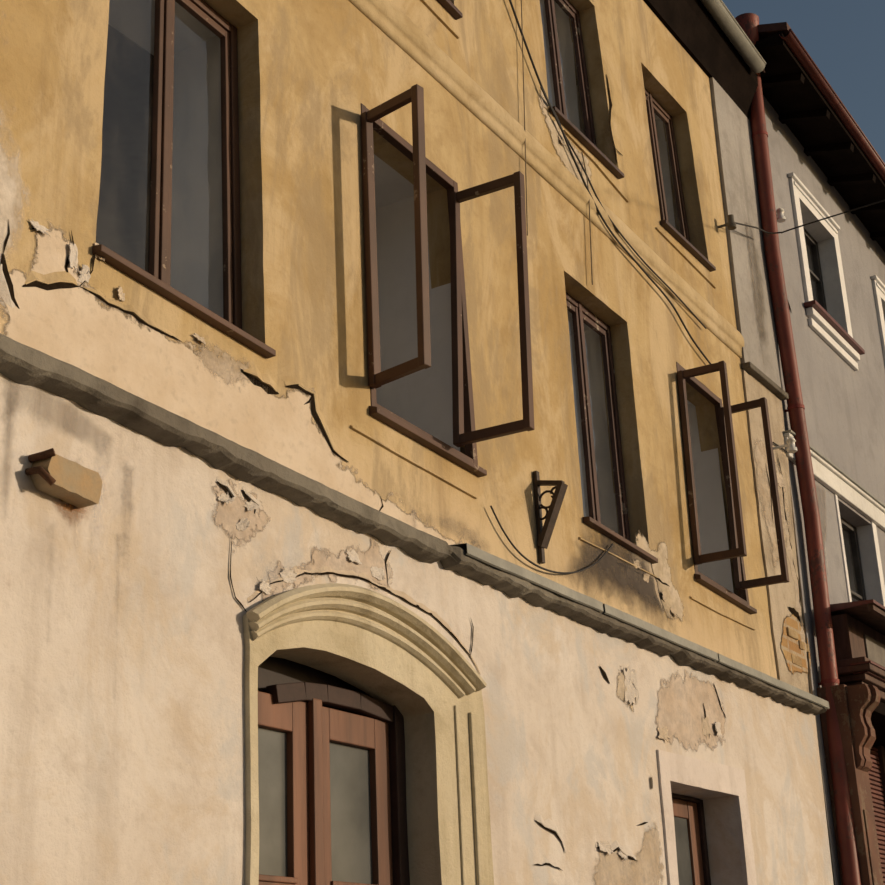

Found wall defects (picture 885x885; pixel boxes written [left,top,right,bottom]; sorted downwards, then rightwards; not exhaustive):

peeling [0,146,460,546]
peeling [259,538,393,601]
peeling [632,533,684,621]
flaking render [781,614,811,674]
peeling [656,670,726,750]
crack [534,814,567,871]
crack [596,840,637,861]
peeling [594,823,664,885]